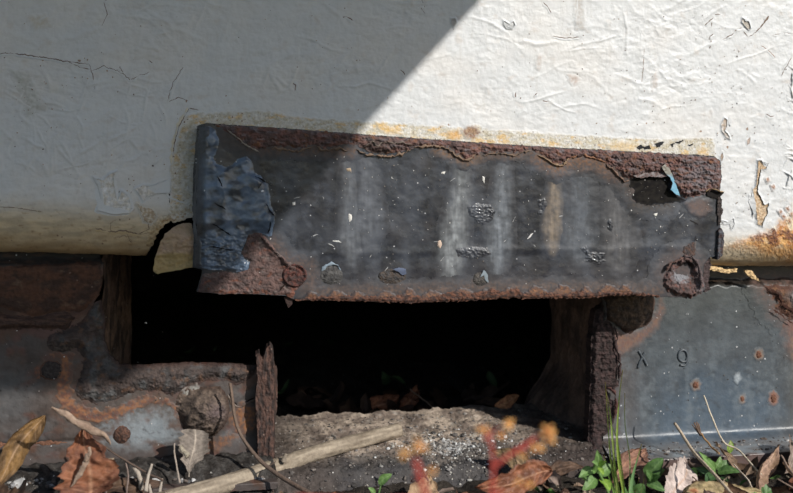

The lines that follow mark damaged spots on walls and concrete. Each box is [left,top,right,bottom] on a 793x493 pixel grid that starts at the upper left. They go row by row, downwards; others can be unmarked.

crack [0,52,152,89]
crack [168,68,197,163]
peeling [90,109,732,226]
peeling [748,157,772,229]
rust [215,124,793,385]
rust [0,261,256,451]
rust [198,229,669,455]